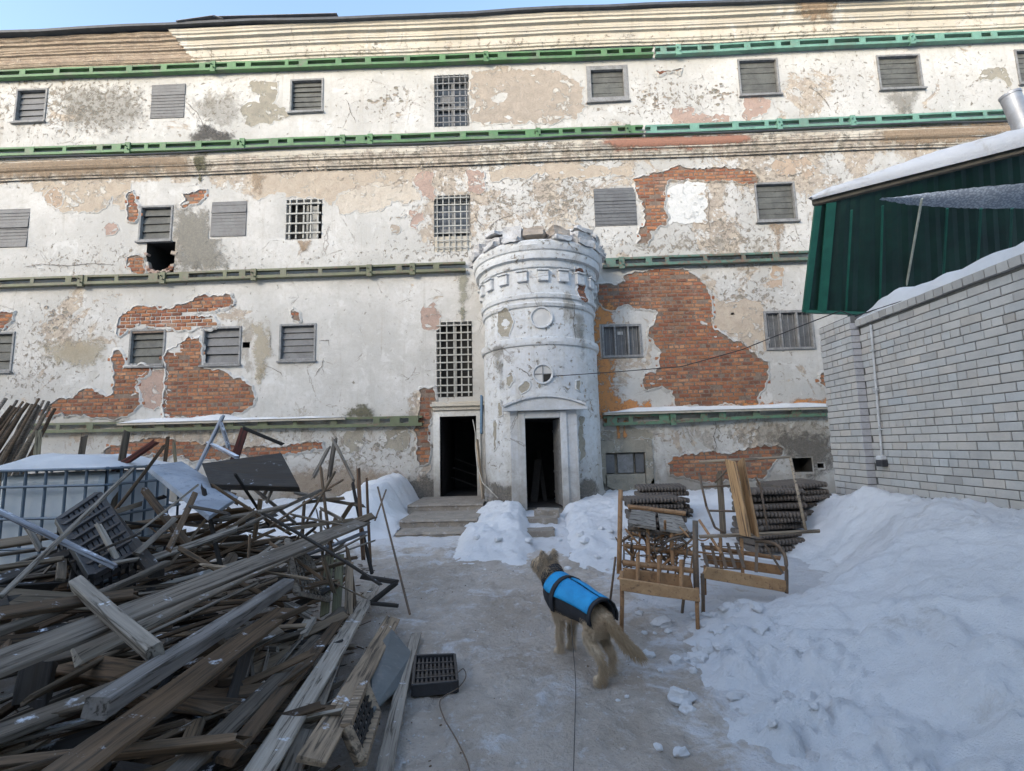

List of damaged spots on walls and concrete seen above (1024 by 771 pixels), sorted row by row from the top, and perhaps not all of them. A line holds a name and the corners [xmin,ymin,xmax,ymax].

peeling [240,79,291,128]
peeling [468,64,587,127]
flaking render [178,187,209,211]
flaking render [464,160,760,247]
flaking render [125,251,178,274]
flaking render [0,309,29,332]
flaking render [37,291,258,422]
peeling [487,307,532,339]
flaking render [573,264,785,406]
flaking render [102,435,326,465]
flaking render [342,385,439,492]
flaking render [665,442,786,485]